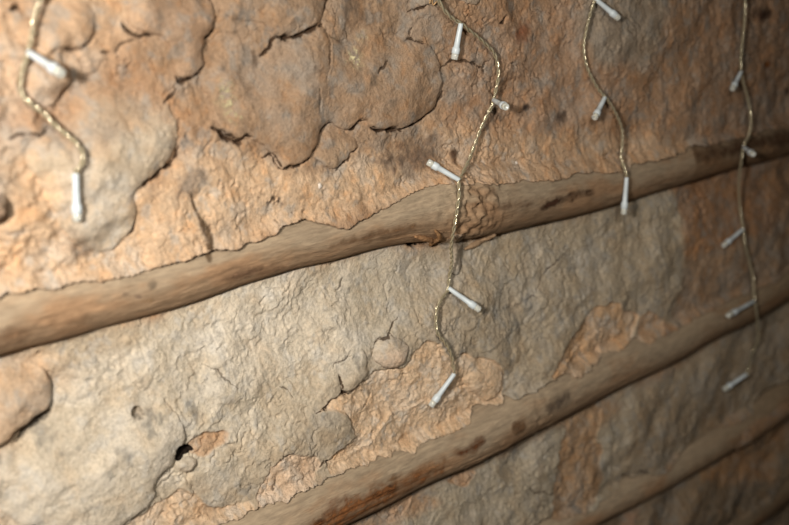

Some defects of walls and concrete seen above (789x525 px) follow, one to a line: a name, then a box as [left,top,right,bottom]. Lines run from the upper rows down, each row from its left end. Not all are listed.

crack [404,5,426,44]
crack [163,67,202,104]
crack [259,0,343,170]
crack [440,58,491,72]
crack [210,126,255,146]
crack [335,91,443,171]
crack [134,146,179,194]
spalling [552,303,662,378]
spalling [126,341,503,525]